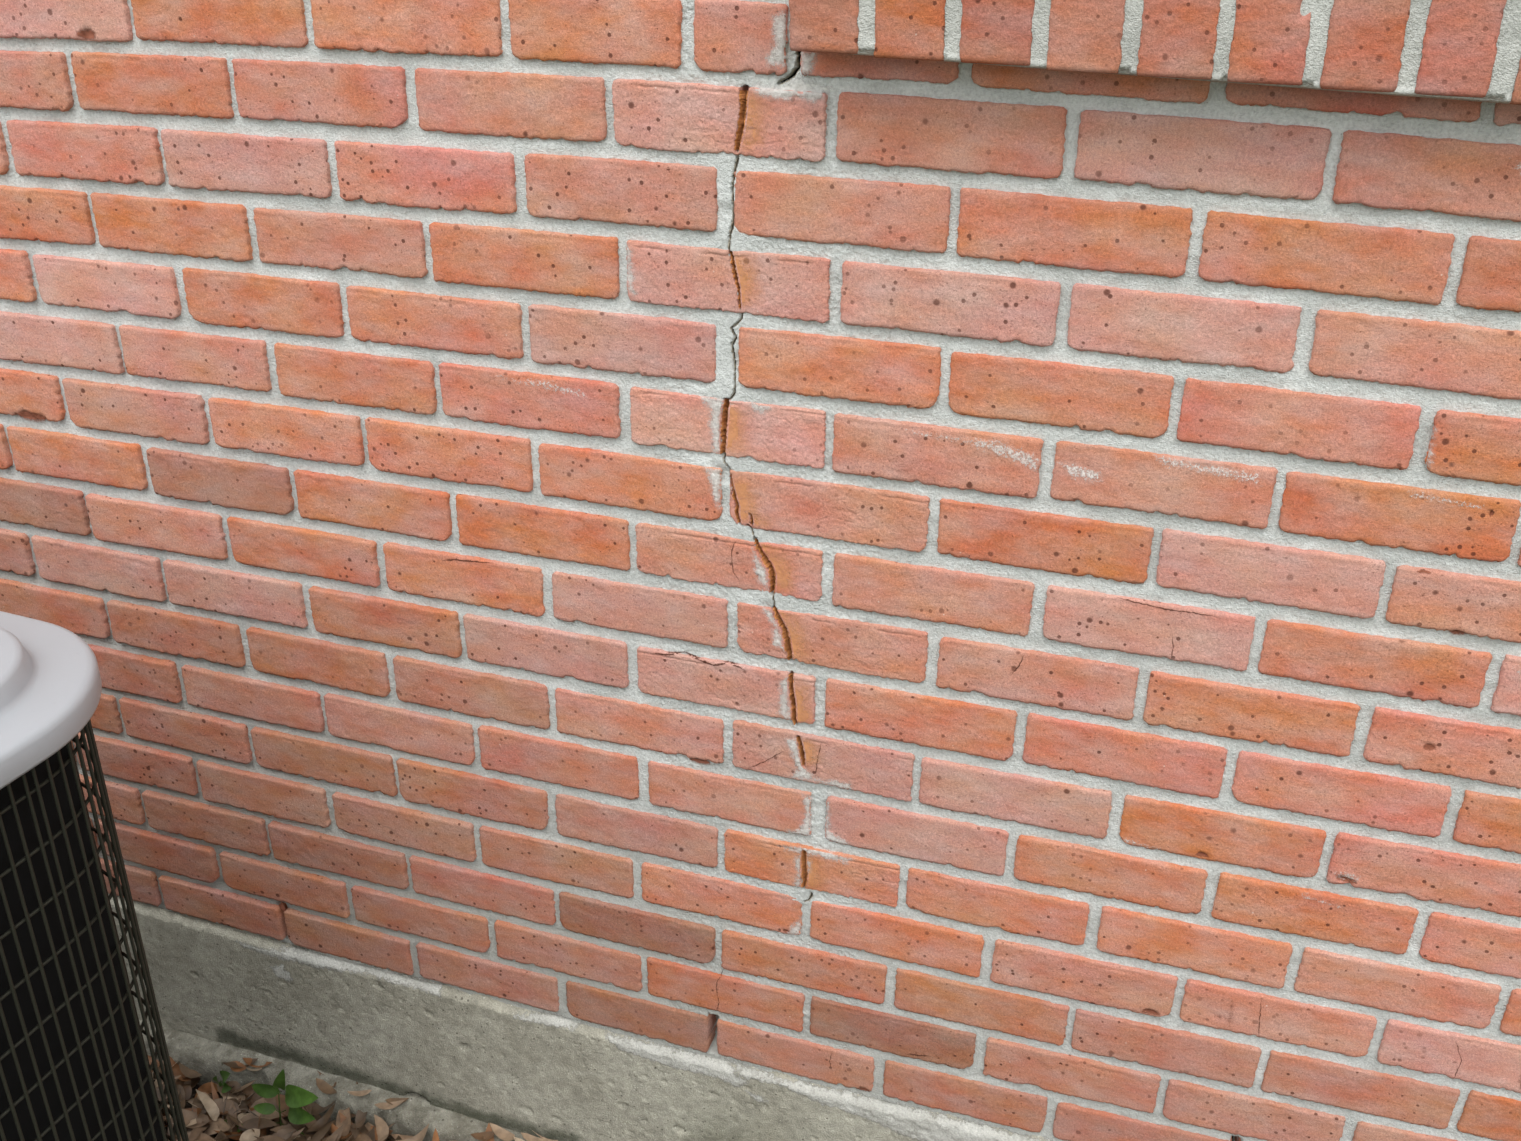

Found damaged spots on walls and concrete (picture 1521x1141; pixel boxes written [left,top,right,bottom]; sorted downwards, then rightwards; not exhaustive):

crack [720,90,821,777]
crack [657,651,744,670]
crack [801,850,816,902]